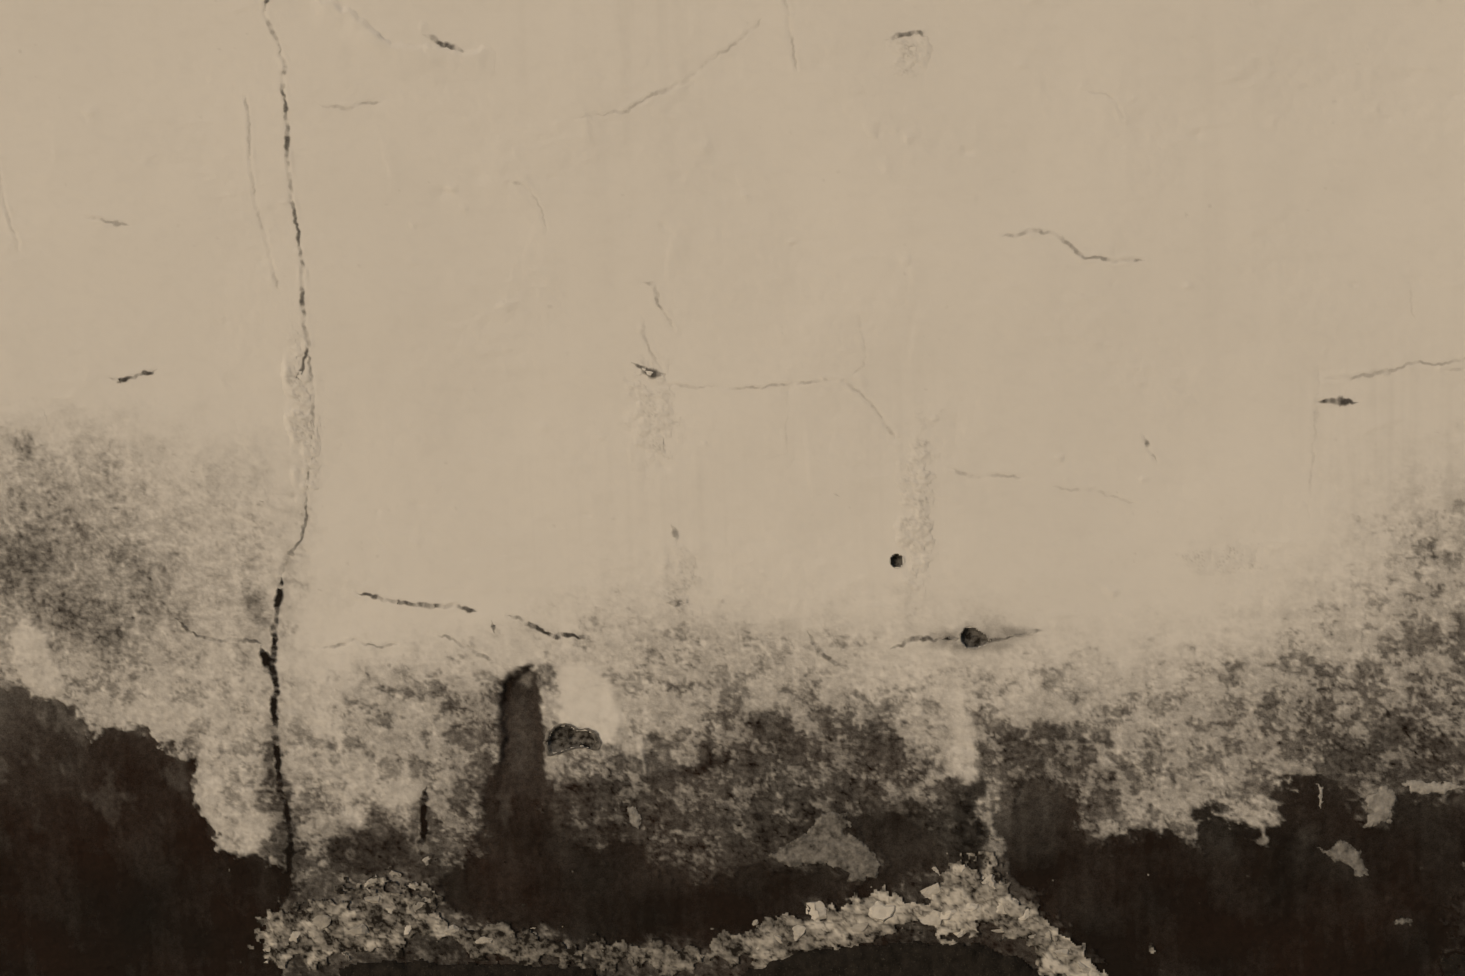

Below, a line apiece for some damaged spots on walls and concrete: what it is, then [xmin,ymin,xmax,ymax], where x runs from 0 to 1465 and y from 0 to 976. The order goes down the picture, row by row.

crack [281,91,289,149]
crack [292,210,300,242]
crack [298,350,308,379]
damp [0,486,180,663]
crack [249,579,283,773]
crack [361,593,579,639]
damp [1337,584,1465,683]
damp [0,687,300,976]
crack [418,789,428,844]
flaking render [240,811,1108,976]
damp [440,671,948,952]
damp [993,775,1465,976]